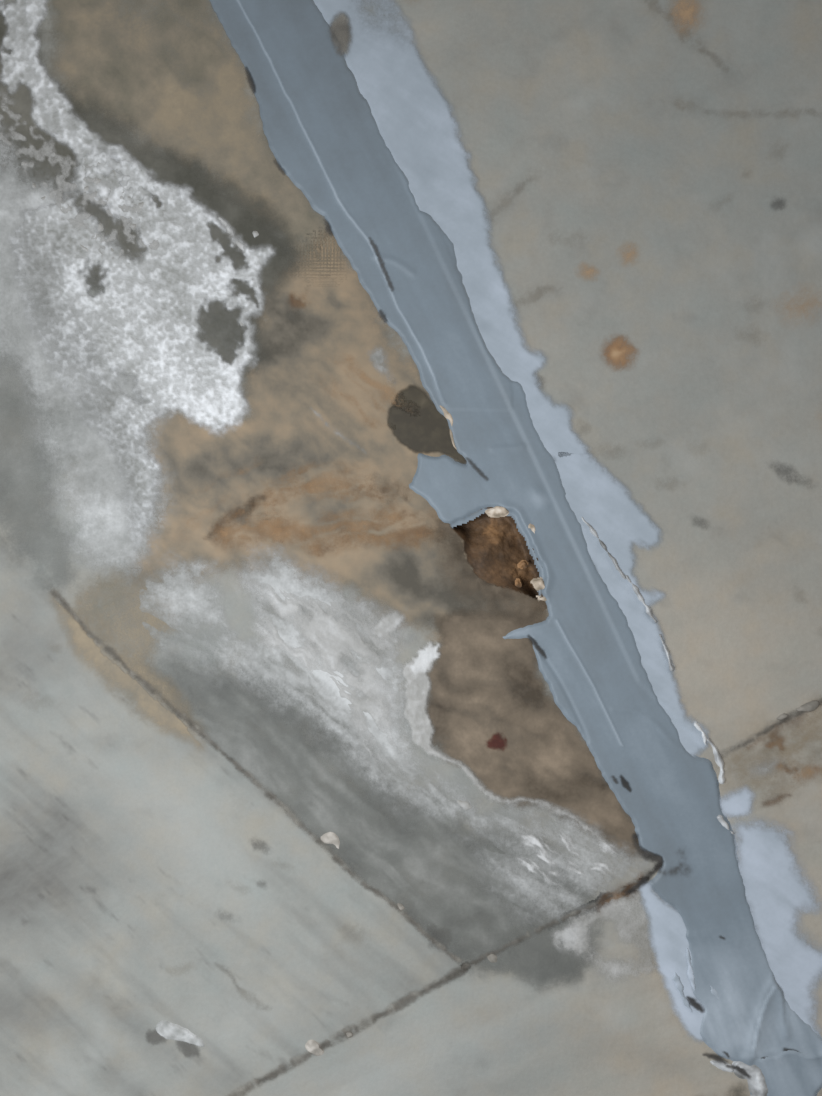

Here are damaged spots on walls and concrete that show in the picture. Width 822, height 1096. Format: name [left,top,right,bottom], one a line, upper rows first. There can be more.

water stain [0,0,297,579]
rust [52,0,641,857]
water stain [140,557,656,984]
peeling [388,386,467,463]
spalling [438,506,547,621]
crack [209,0,822,1096]